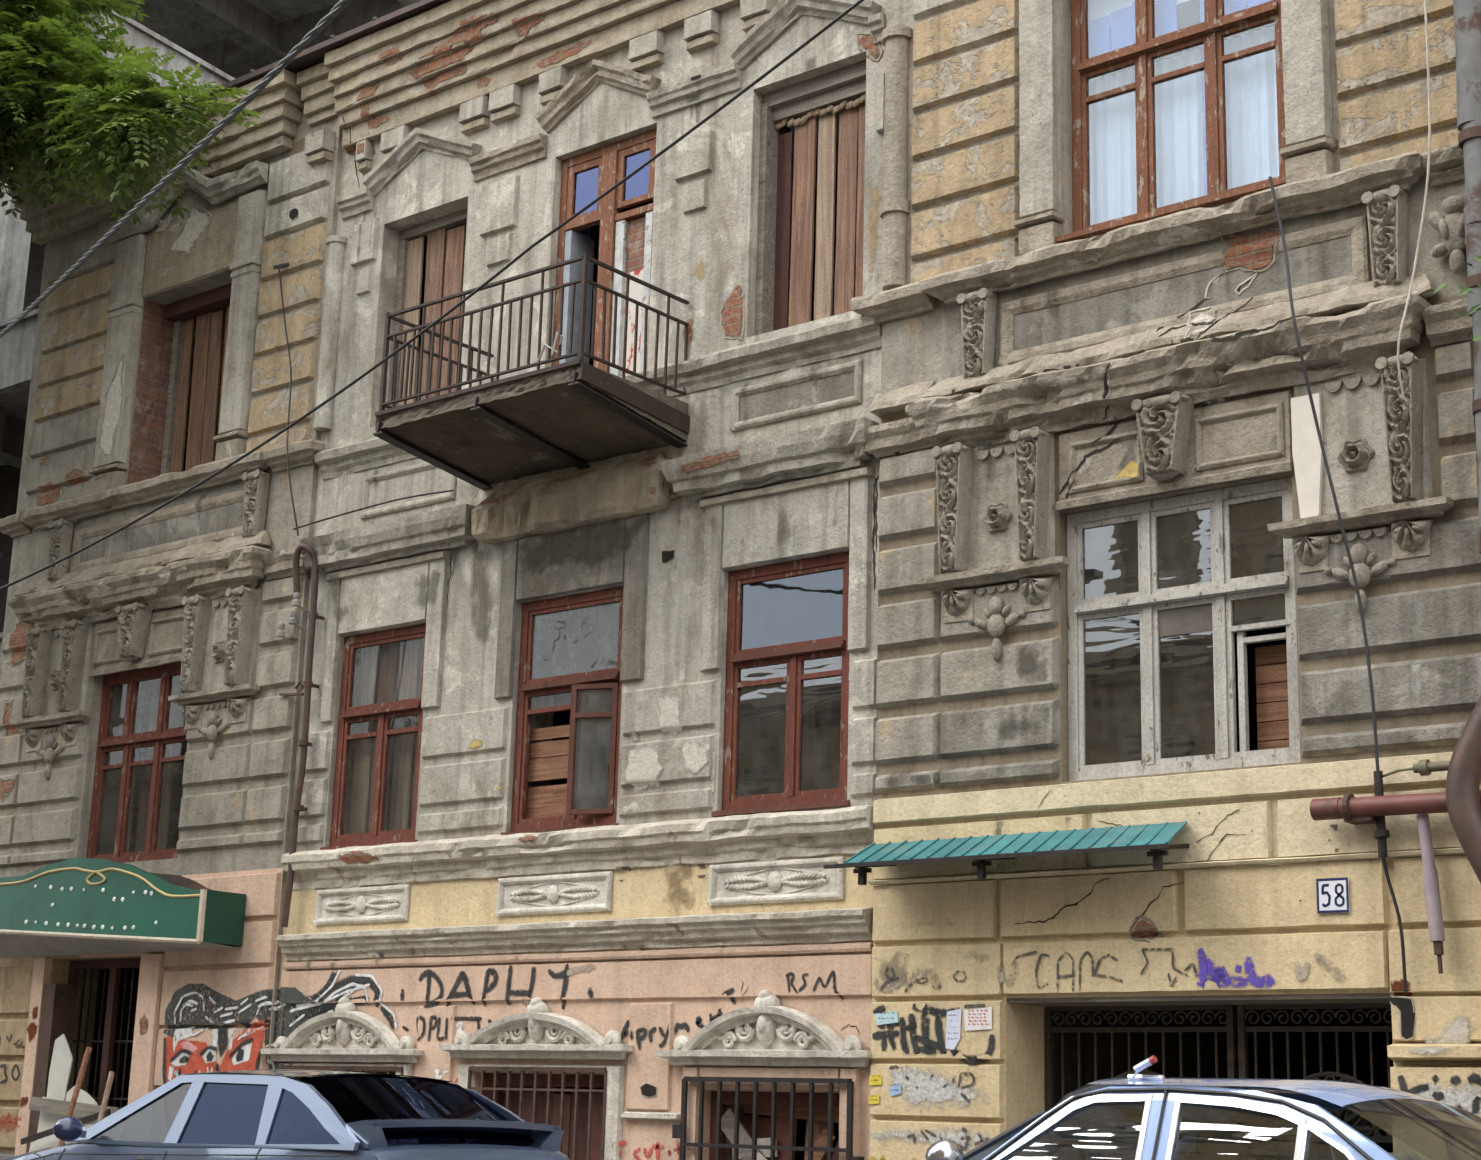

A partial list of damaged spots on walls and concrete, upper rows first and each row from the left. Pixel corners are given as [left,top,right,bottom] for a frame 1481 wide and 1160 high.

flaking render [379,12,545,96]
flaking render [335,80,388,155]
flaking render [720,284,745,341]
crack [1156,273,1256,339]
flaking render [1153,222,1285,339]
flaking render [98,354,127,458]
crack [1059,363,1120,499]
flaking render [36,468,90,507]
flaking render [621,729,663,815]
flaking render [638,694,716,802]
crack [1015,878,1110,924]
crack [1136,809,1246,921]